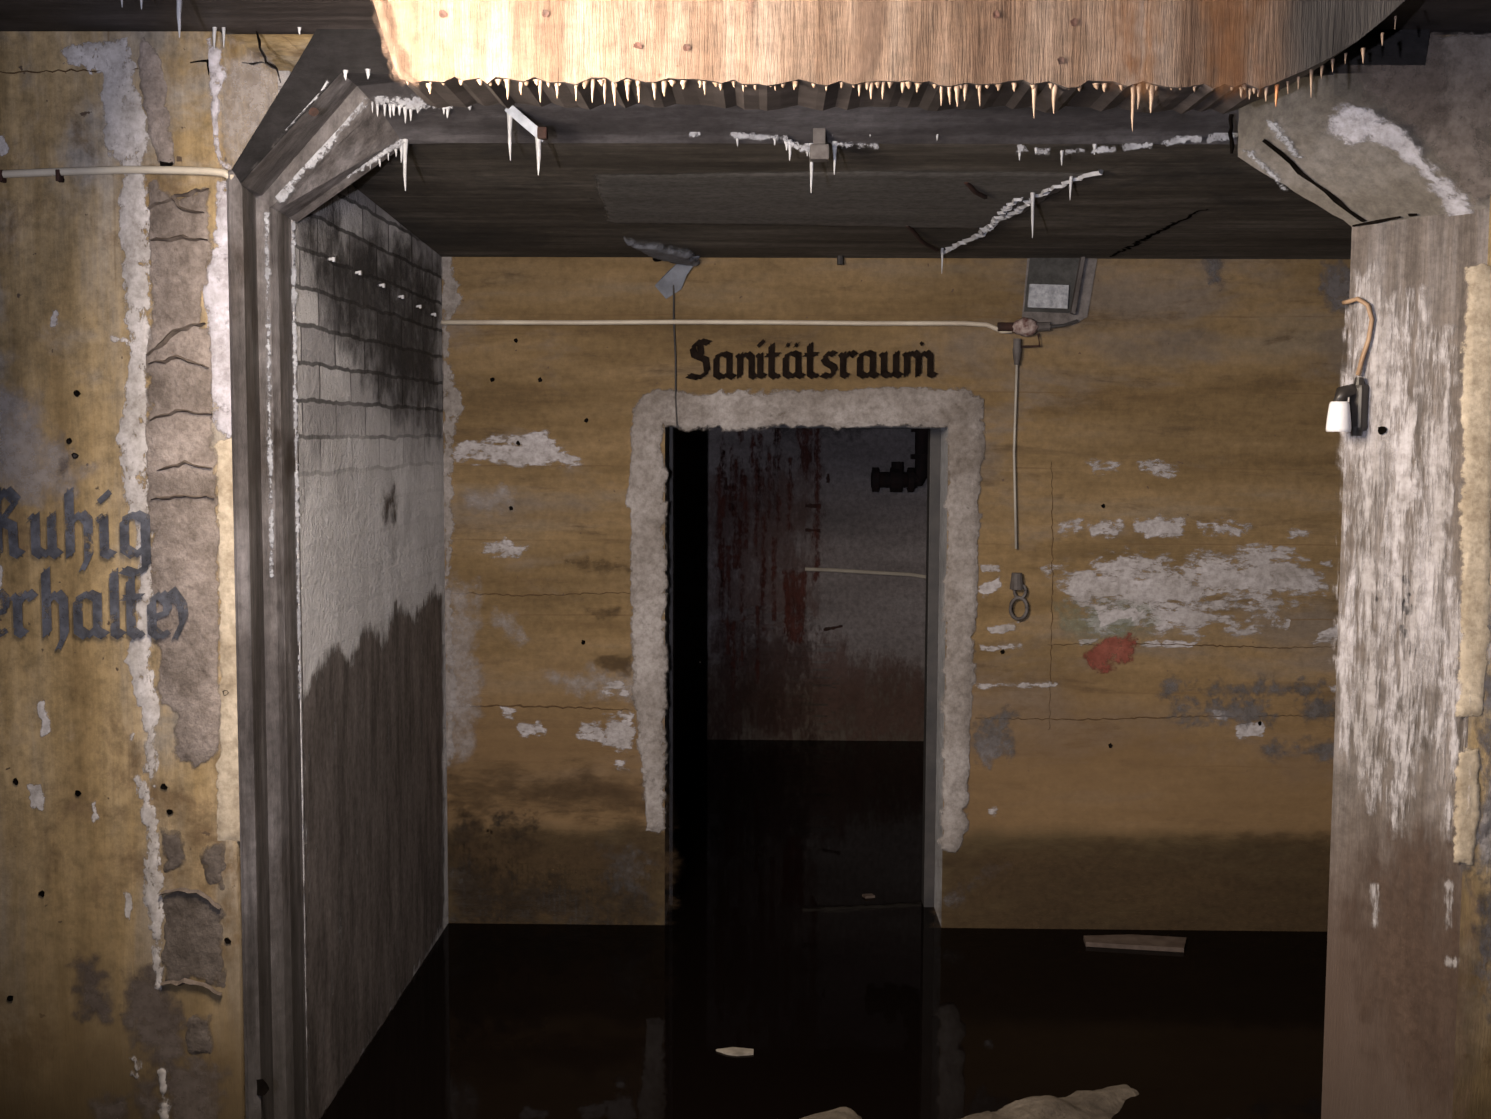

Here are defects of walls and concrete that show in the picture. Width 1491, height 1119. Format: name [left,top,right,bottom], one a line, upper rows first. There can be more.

crack [147,188,209,242]
crack [1228,114,1417,227]
leakage [1329,34,1472,216]
crack [146,322,209,368]
leakage [264,96,452,577]
crack [150,460,215,500]
peeling [1138,459,1176,478]
leakage [291,213,669,1119]
rust [715,428,830,683]
peeling [1041,517,1332,637]
peeling [1313,624,1338,644]
leakage [1335,265,1491,988]